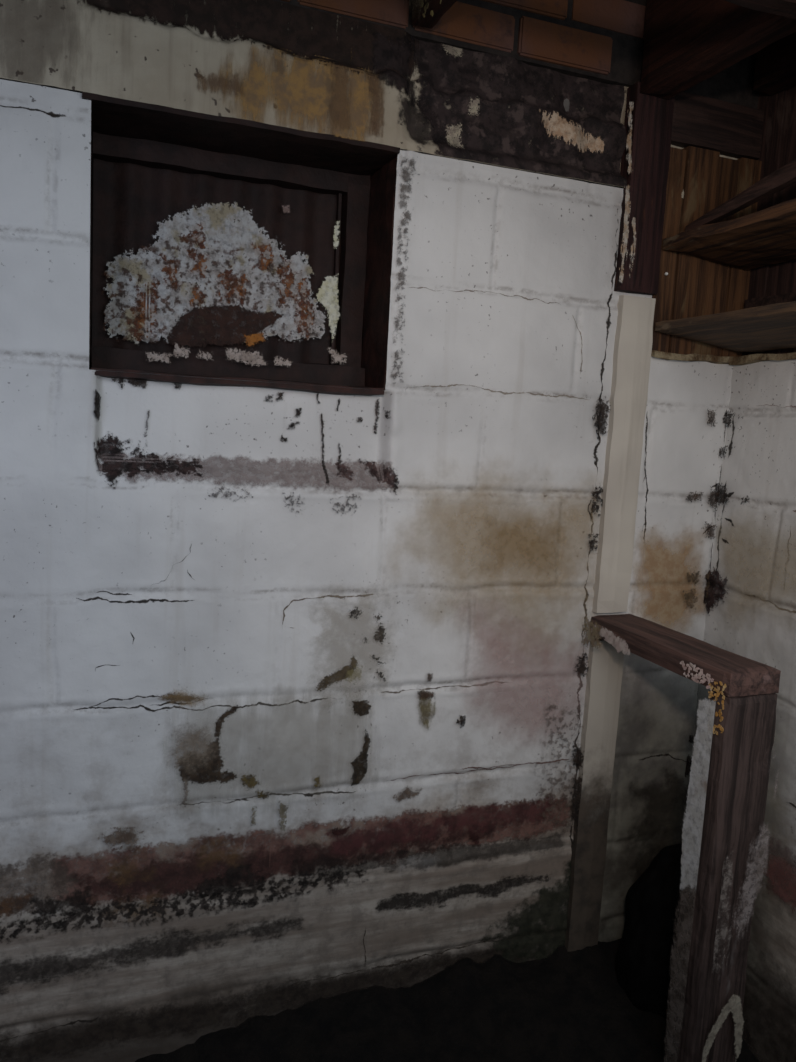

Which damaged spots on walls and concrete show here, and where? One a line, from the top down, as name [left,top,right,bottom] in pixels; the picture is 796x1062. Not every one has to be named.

peeling [539,110,604,153]
peeling [103,202,347,364]
crack [409,209,618,473]
mould [592,396,611,439]
mould [685,480,749,511]
crack [78,544,193,603]
damp [639,542,729,627]
crack [76,695,334,712]
crack [382,499,594,848]
spalling [173,705,240,807]
spalling [351,729,370,786]
damp [0,861,572,1062]